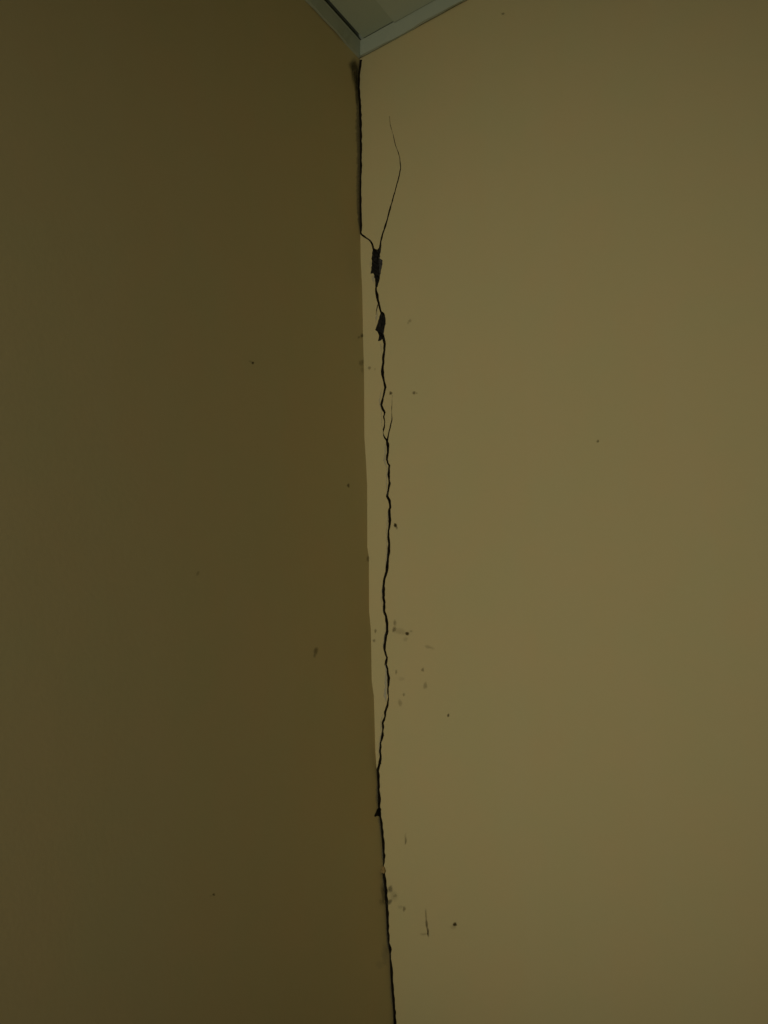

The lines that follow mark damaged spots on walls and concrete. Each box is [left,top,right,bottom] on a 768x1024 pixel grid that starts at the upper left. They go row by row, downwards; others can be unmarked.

crack [356,60,401,252]
crack [375,287,397,1024]